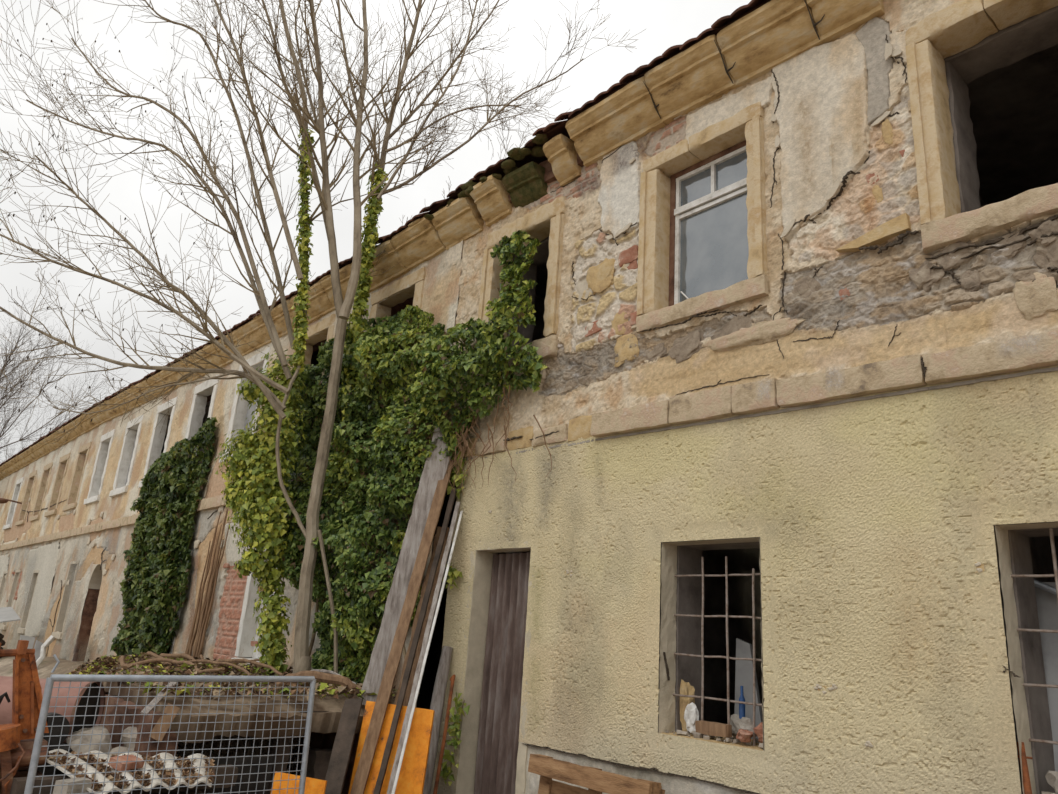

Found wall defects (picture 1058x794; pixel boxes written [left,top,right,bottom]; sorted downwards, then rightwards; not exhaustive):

crack [643,81,661,119]
crack [640,151,870,395]
crack [770,70,780,208]
spalling [524,17,1058,396]
crack [859,230,919,254]
crack [925,215,1058,285]